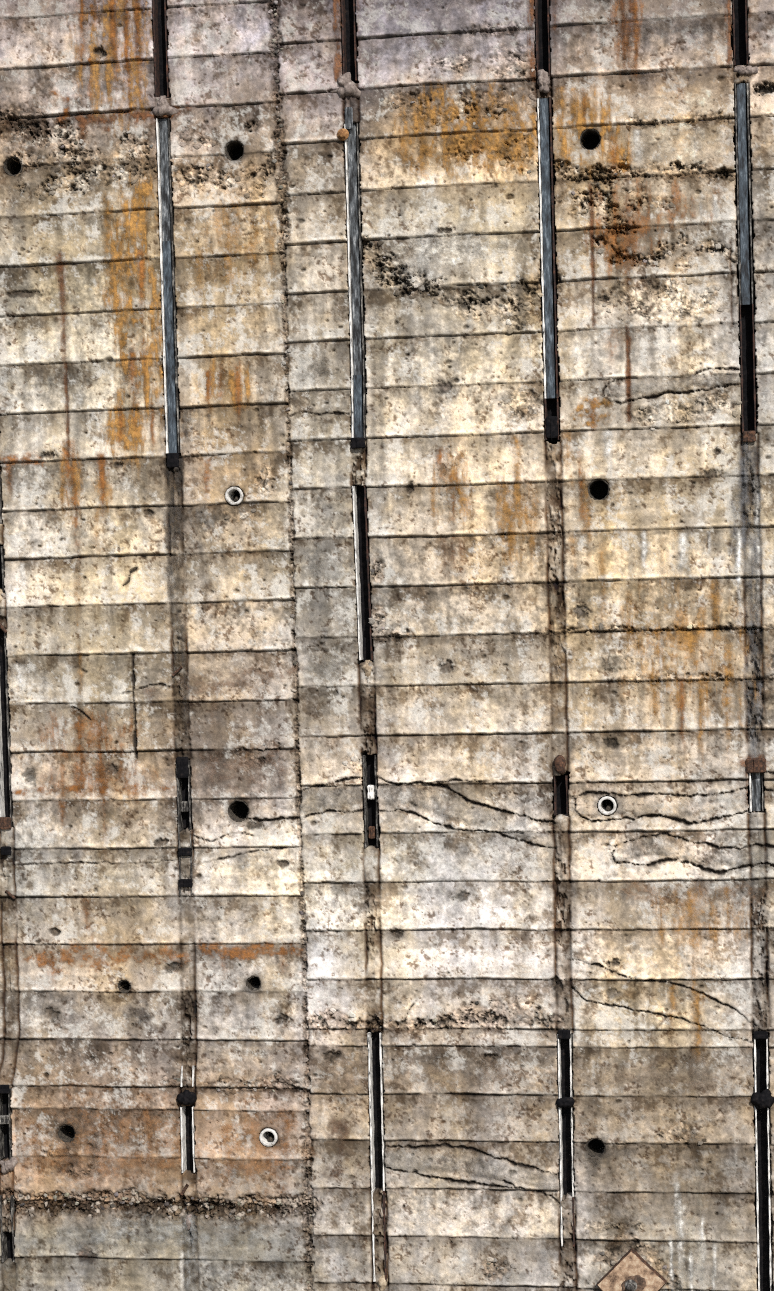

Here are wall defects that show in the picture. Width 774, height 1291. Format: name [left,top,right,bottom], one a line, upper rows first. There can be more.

spalling [0,104,279,201]
corrosion [400,89,538,176]
spalling [362,234,565,334]
spalling [554,159,739,328]
corrosion [98,181,164,506]
spalling [498,386,544,422]
crack [603,367,739,403]
crack [194,771,774,875]
spalling [303,996,566,1034]
crack [565,963,764,1042]
spalling [0,1145,323,1223]
crack [387,1143,560,1204]